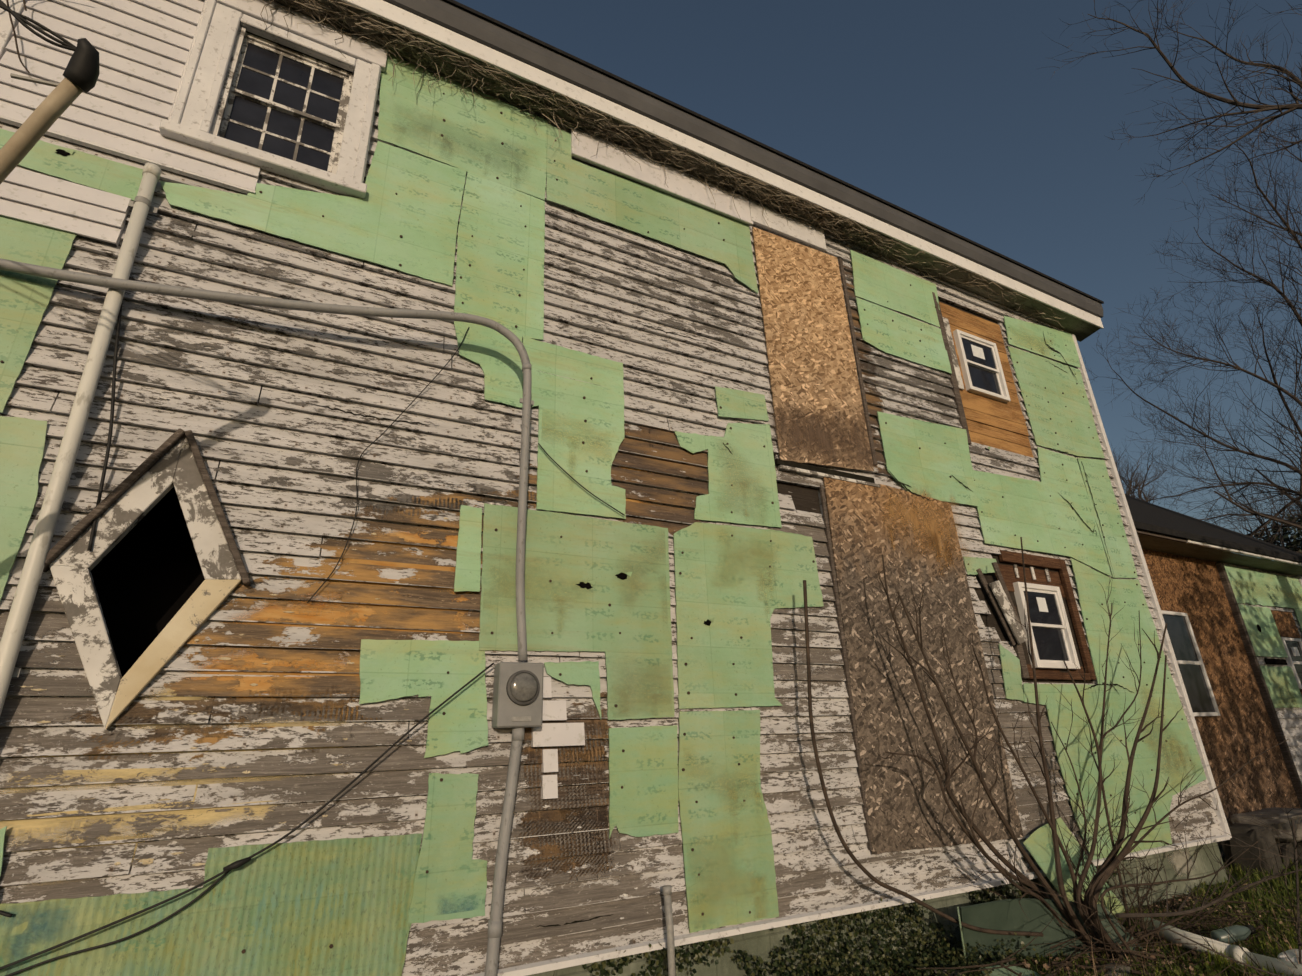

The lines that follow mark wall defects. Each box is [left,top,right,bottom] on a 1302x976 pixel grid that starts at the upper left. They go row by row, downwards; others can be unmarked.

peeling [545,215,769,375]
peeling [611,369,714,535]
peeling [775,467,823,493]
peeling [841,265,961,482]
peeling [0,207,688,976]
peeling [758,514,974,918]